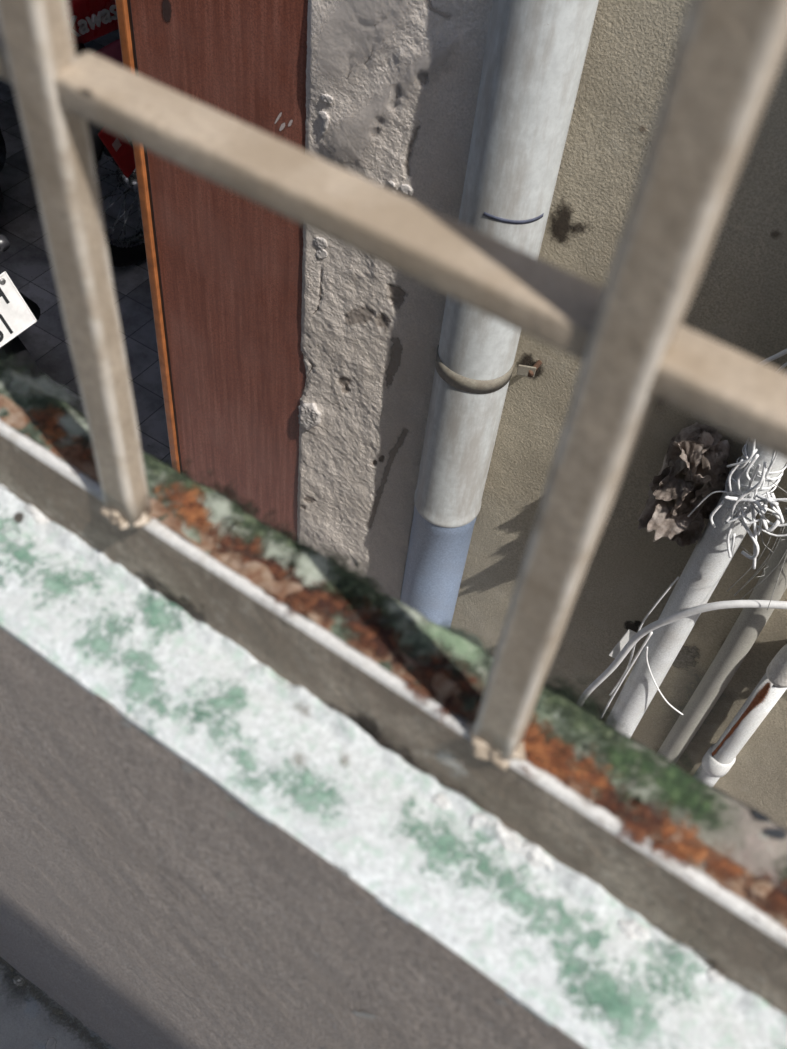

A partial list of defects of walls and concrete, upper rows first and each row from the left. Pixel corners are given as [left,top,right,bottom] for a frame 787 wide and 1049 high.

peeling [319,94,333,136]
peeling [388,181,414,196]
spalling [345,284,405,385]
spalling [339,377,350,393]
damp [203,494,238,525]
damp [264,541,333,586]
damp [388,601,489,663]
rust [711,682,771,757]
damp [753,808,787,839]